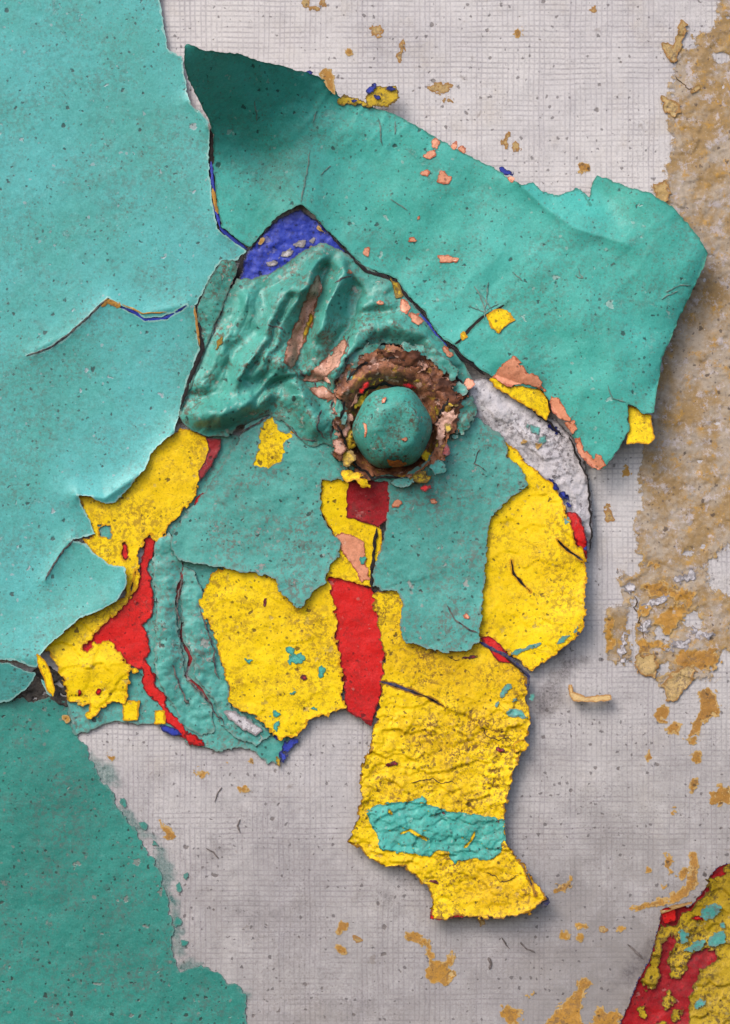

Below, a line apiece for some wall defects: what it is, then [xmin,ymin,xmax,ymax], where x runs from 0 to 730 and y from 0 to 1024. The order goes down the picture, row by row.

peeling [661,19,688,63]
crack [208,129,247,250]
peeling [239,208,345,280]
peeling [653,180,672,202]
crack [26,298,205,409]
peeling [486,309,515,333]
rust [323,342,477,492]
peeling [12,377,593,766]
peeling [603,561,723,702]
crack [379,681,443,706]
peeling [568,685,612,703]
peeling [620,863,730,1024]